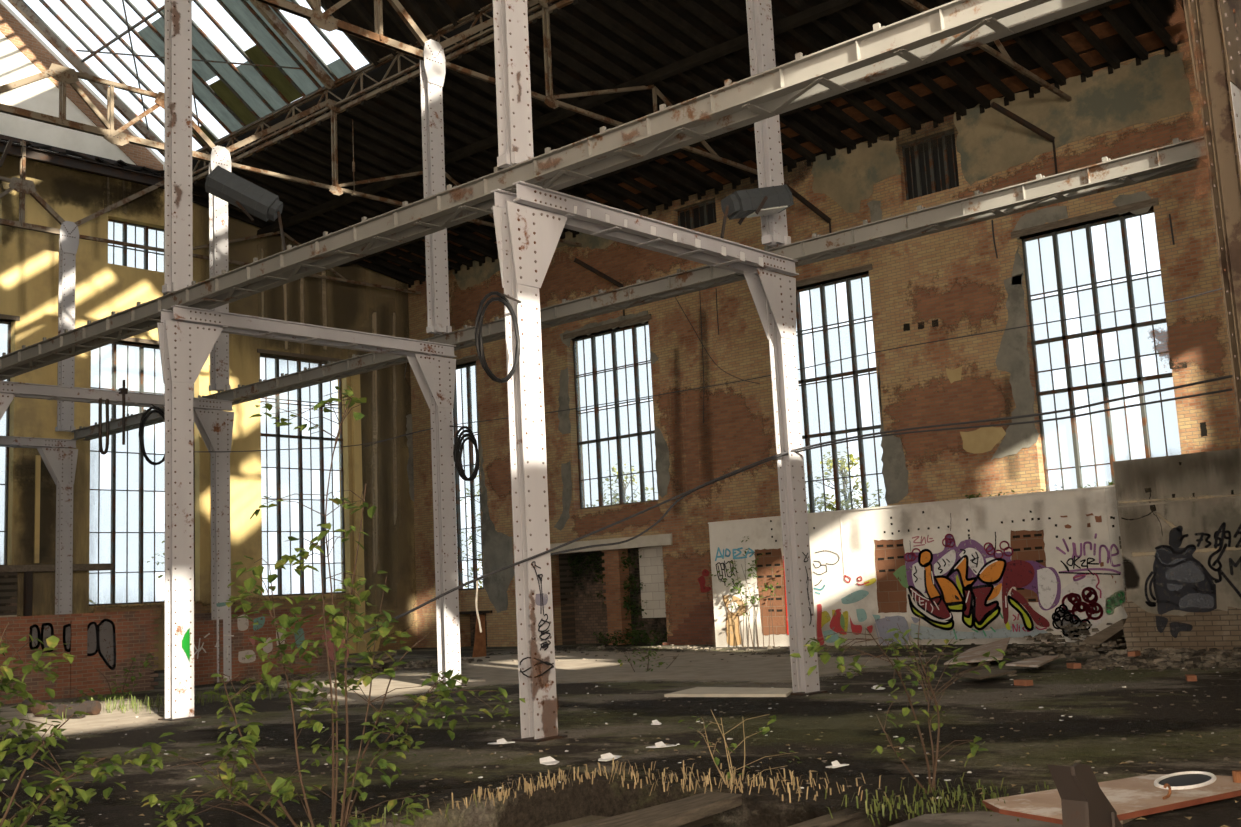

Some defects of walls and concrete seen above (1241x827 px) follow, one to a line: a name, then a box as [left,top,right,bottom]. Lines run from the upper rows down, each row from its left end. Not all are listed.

flaking render [811,137,901,222]
flaking render [1112,191,1152,215]
spalling [878,206,1068,504]
rust [529,591,559,738]